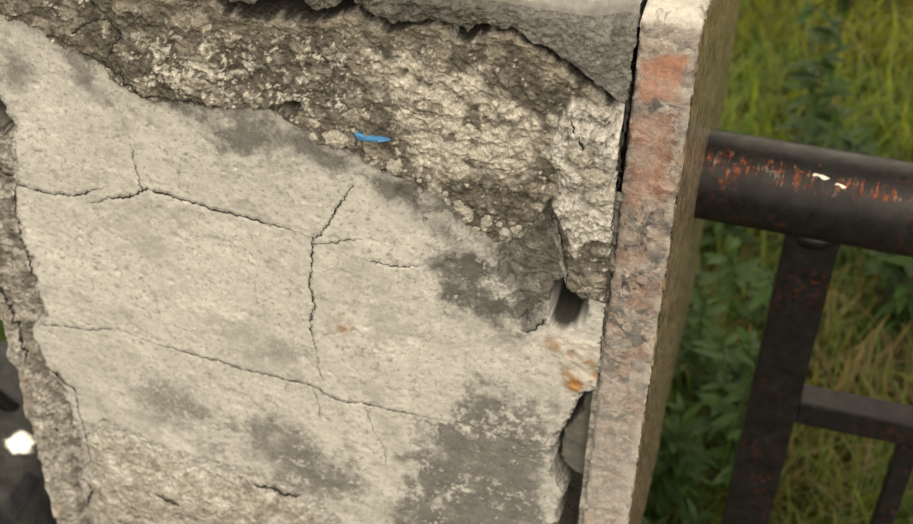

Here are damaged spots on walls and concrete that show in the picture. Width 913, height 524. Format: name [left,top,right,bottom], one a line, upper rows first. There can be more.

spalling [0,95,93,524]
crack [0,144,537,505]
spalling [0,0,622,328]
crack [519,200,568,333]
corrosion [564,371,583,392]
crack [596,85,634,388]
corrosion [701,146,913,203]